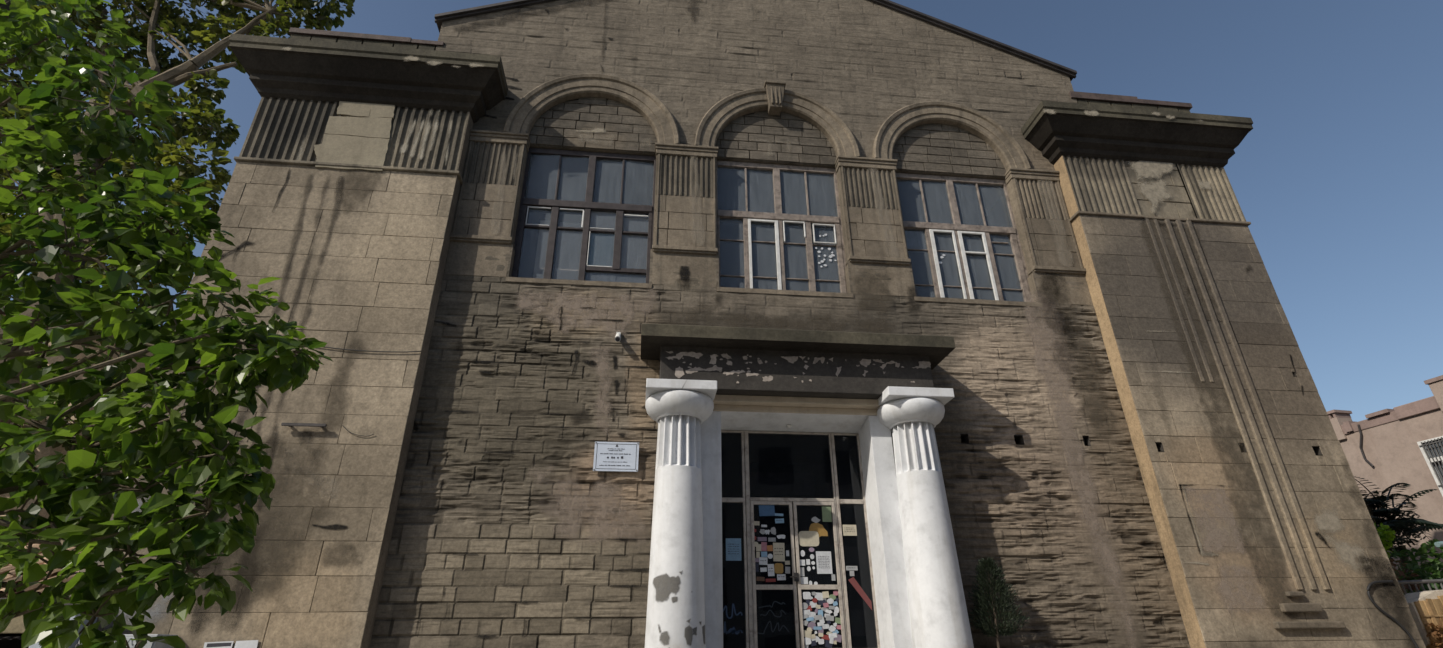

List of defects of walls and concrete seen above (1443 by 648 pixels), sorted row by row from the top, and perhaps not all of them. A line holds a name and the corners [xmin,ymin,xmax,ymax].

spalling [1131,161,1173,212]
damp [273,170,371,350]
peeling [666,351,931,383]
damp [1142,218,1296,616]
damp [191,386,304,631]
peeling [653,572,682,603]
peeling [658,620,705,645]
damp [1362,524,1416,648]